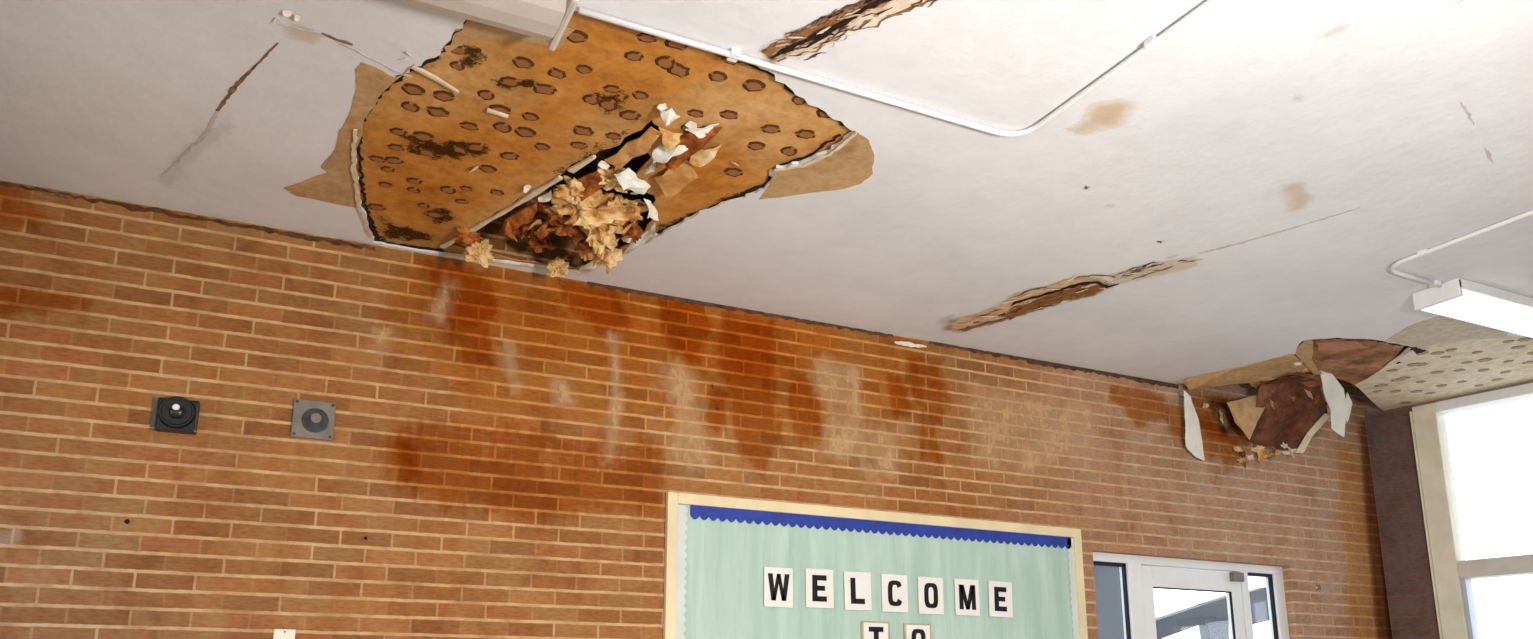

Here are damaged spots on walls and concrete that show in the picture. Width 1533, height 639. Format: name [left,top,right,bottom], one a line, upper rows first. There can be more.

crack [762,0,937,62]
crack [0,10,412,250]
spalling [284,11,874,277]
crack [587,208,1359,389]
spalling [1234,442,1297,463]
peeling [1355,315,1533,411]